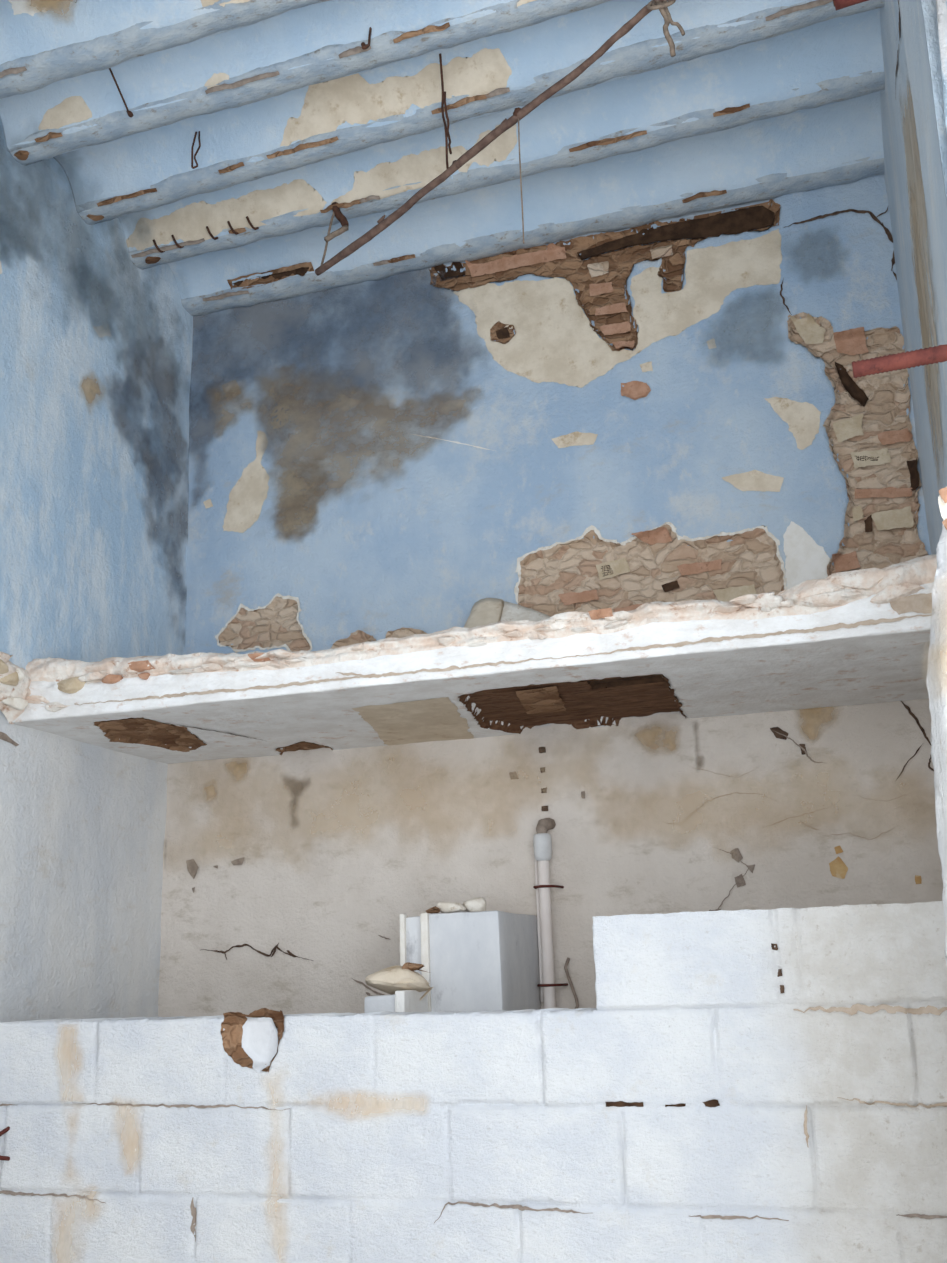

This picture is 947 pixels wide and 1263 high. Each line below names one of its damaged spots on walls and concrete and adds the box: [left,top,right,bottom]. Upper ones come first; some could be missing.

peeling [280,48,512,147]
peeling [429,199,782,400]
water stain [82,269,467,597]
flaking render [514,312,932,620]
flaking render [128,660,155,674]
flaking render [215,593,312,662]
flaking render [330,627,427,649]
crack [201,943,313,961]
spalling [220,1008,284,1073]